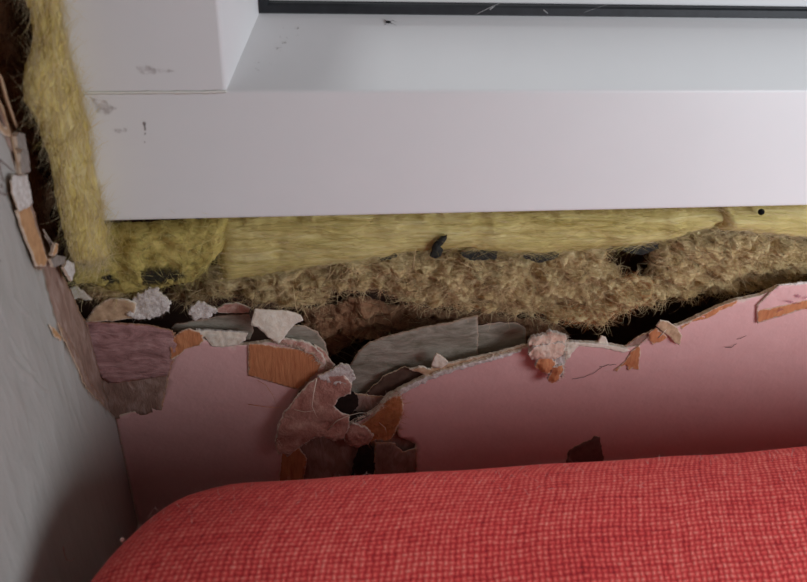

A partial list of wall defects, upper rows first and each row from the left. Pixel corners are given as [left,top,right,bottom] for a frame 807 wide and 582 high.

peeling [756,281,807,324]
peeling [251,308,303,343]
peeling [431,353,449,368]
spalling [614,329,653,372]
spalling [566,436,604,463]